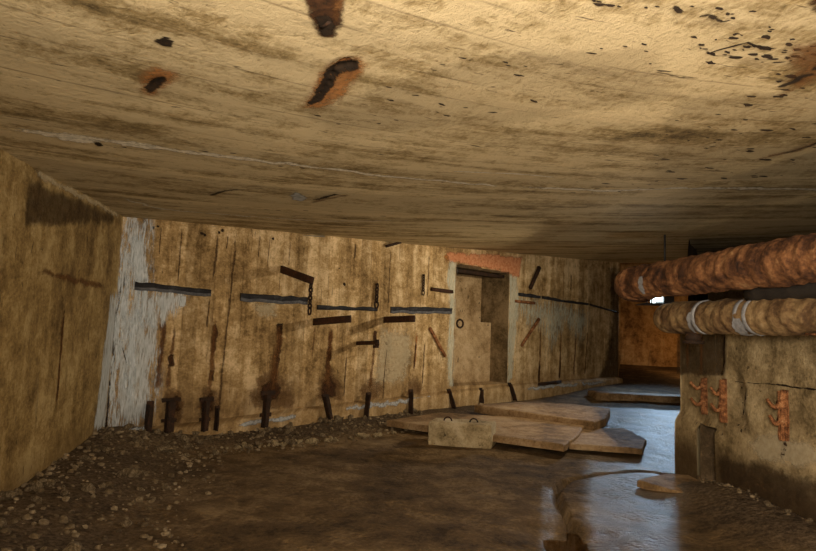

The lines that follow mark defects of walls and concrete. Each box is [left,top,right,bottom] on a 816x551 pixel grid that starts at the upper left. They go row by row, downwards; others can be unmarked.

corrosion [306,0,344,37]
water stain [26,184,114,225]
water stain [94,217,186,430]
efflorescence [239,415,296,427]